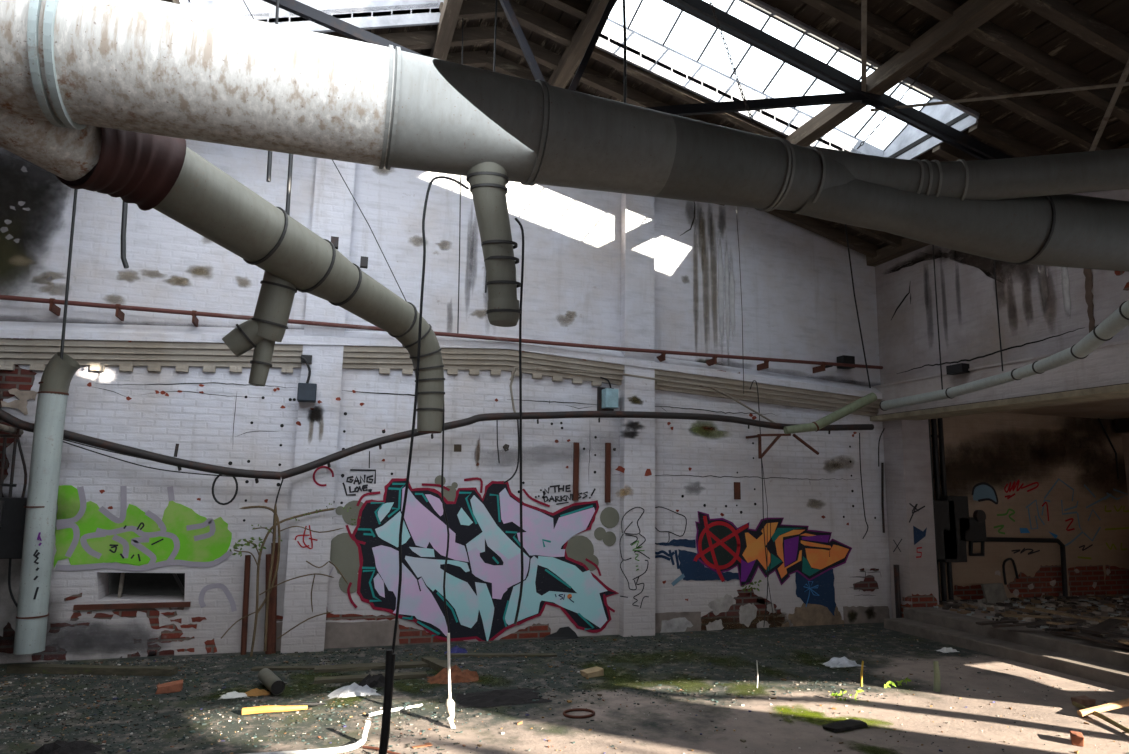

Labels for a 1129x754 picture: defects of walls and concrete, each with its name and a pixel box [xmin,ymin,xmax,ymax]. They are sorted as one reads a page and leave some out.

water stain [0,147,63,293]
water stain [120,268,209,284]
water stain [683,207,735,349]
water stain [889,248,1070,321]
spalling [0,365,38,497]
water stain [933,417,1127,496]
flaking render [0,559,22,654]
spalling [31,593,217,661]
spalling [701,588,844,628]
spalling [954,583,986,600]
spalling [1007,565,1129,598]